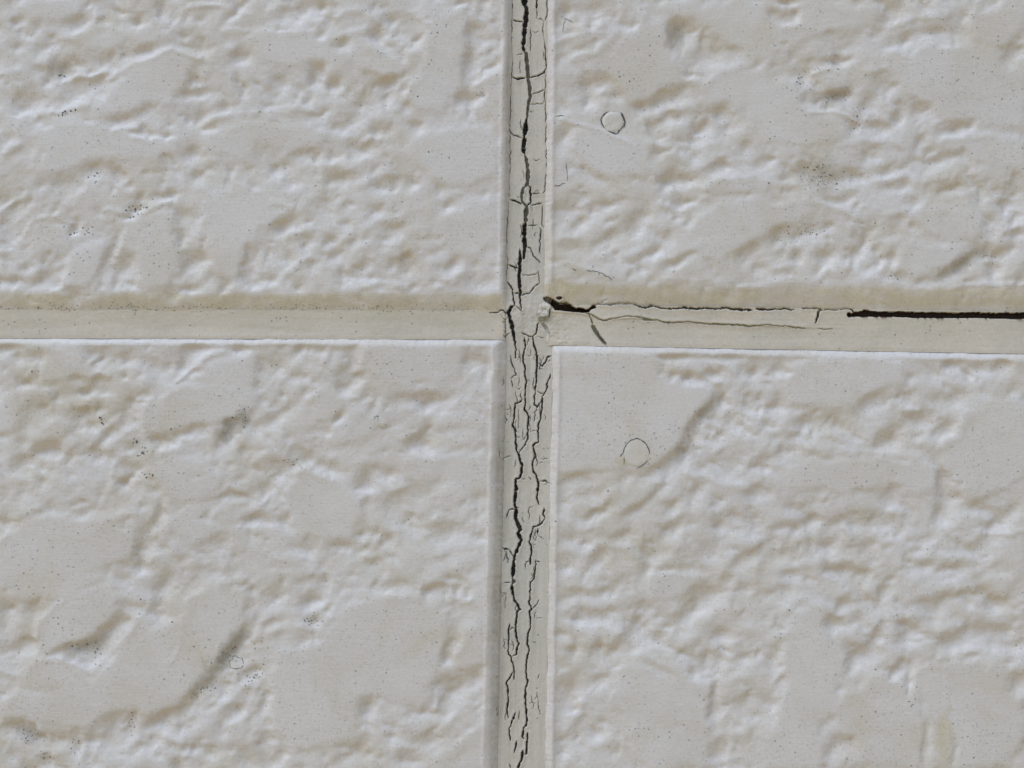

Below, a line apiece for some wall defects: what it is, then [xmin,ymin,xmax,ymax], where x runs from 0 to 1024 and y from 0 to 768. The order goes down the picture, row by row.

crack [484,0,573,768]
crack [573,269,854,330]